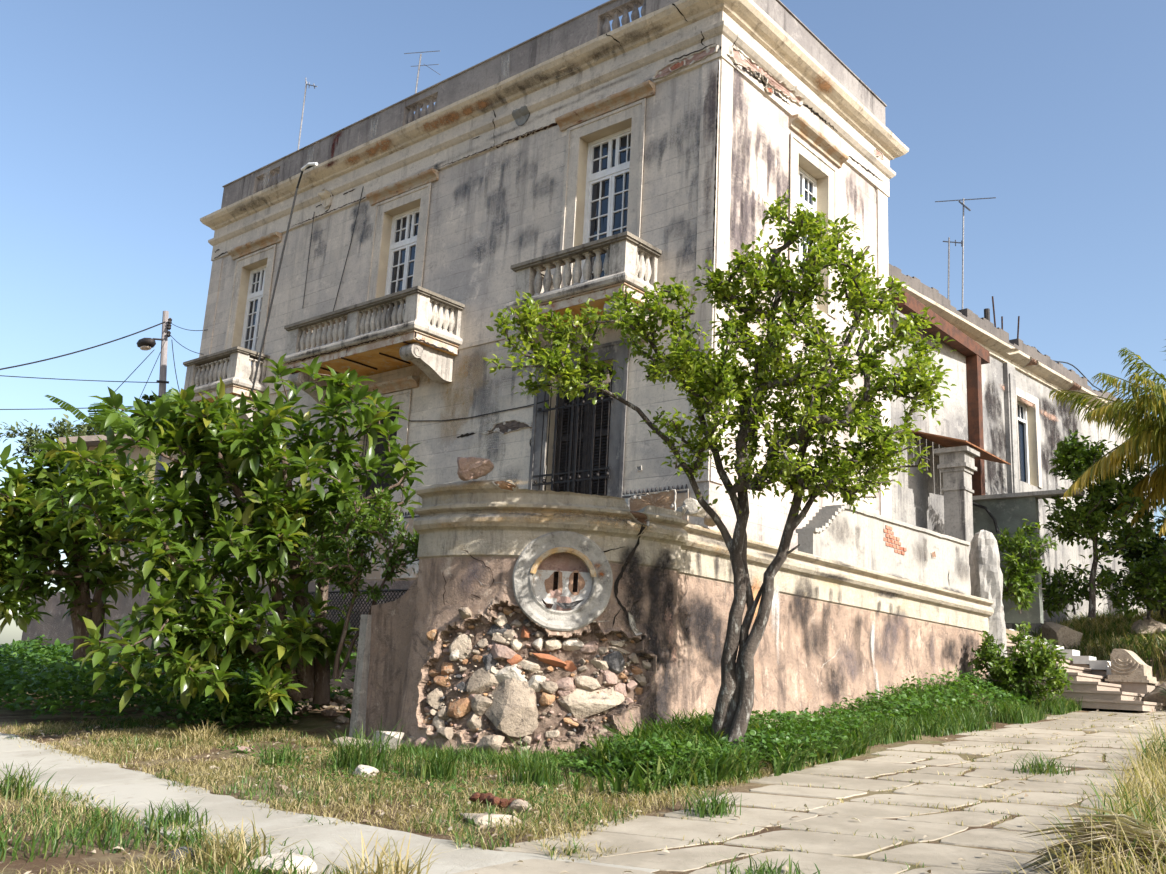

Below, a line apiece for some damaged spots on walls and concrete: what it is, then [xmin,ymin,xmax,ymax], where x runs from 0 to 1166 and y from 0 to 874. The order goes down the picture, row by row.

leakage [704,76,716,132]
flaking render [652,45,804,106]
leakage [730,65,790,254]
crack [671,3,882,265]
leakage [818,76,832,92]
flaking render [420,603,653,755]
crack [593,525,645,626]
leakage [620,548,726,729]
leakage [794,573,847,651]
leakage [828,651,856,700]
leakage [856,591,903,660]
flaking render [883,525,907,555]